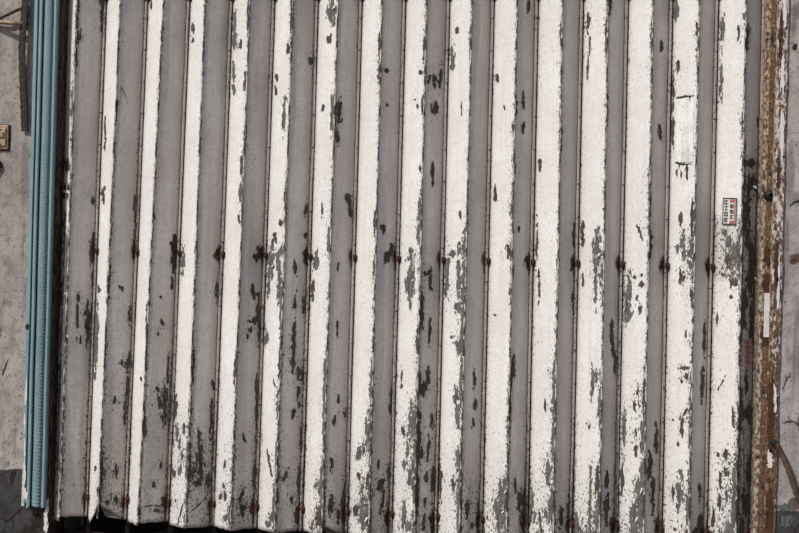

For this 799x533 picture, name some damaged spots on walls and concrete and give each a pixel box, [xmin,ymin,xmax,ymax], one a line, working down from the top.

peeling [404,189,433,351]
peeling [444,211,466,430]
peeling [572,220,603,314]
peeling [675,198,695,301]
peeling [721,158,757,339]
rust [762,240,779,293]
peeling [311,353,390,533]
peeling [493,359,615,533]
peeling [619,379,659,533]
peeling [671,448,751,533]
rust [765,479,773,533]
rust [767,372,775,453]